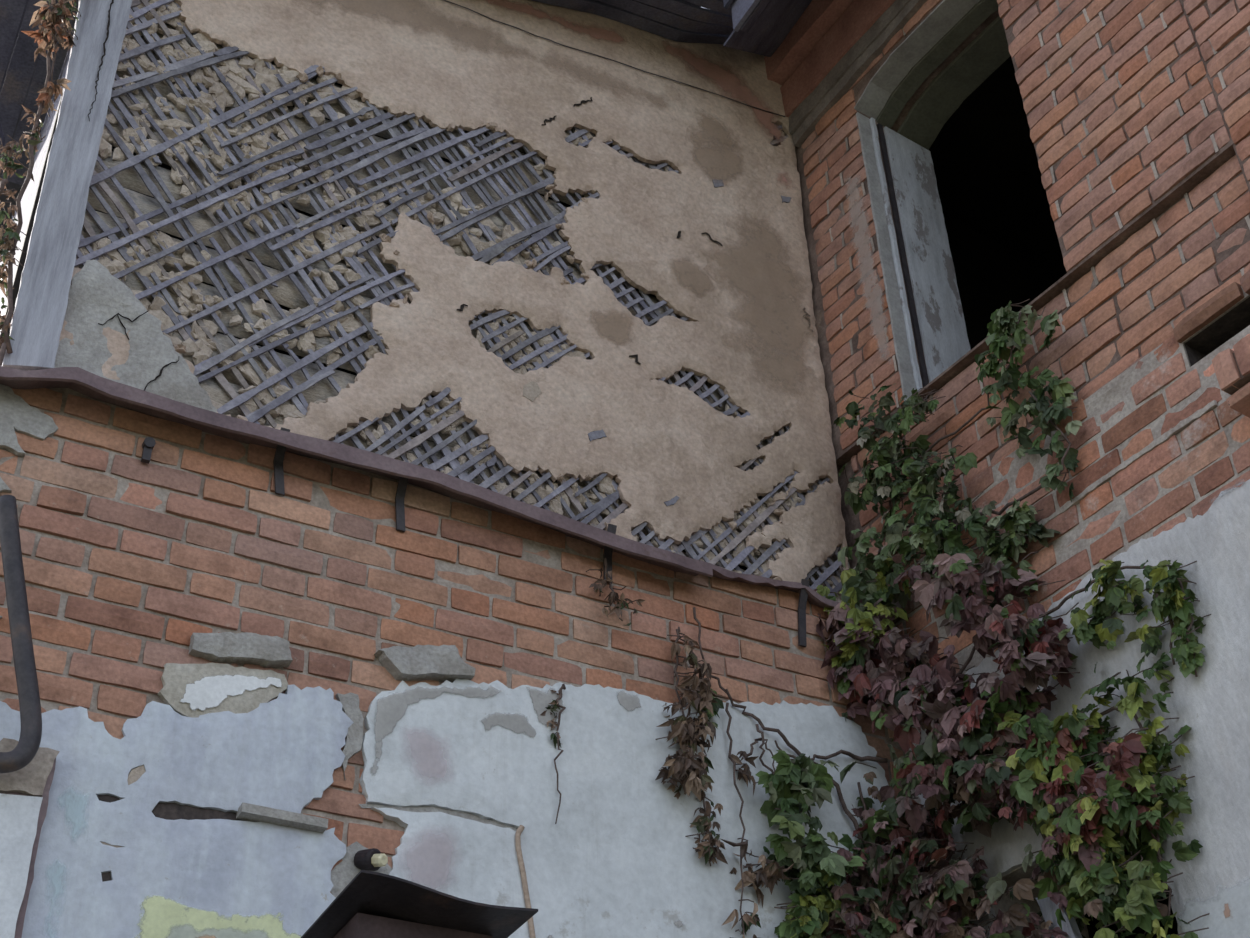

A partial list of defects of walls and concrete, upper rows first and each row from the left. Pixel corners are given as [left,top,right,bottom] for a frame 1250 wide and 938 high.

crack [98,310,149,340]
leakage [594,312,630,343]
leakage [673,223,814,390]
crack [144,360,179,391]
flaking render [965,649,1005,697]
flaking render [0,701,21,741]
flaking render [1037,479,1250,938]
flaking render [22,663,889,938]
flaking render [918,794,1044,894]
flaking render [973,908,996,938]